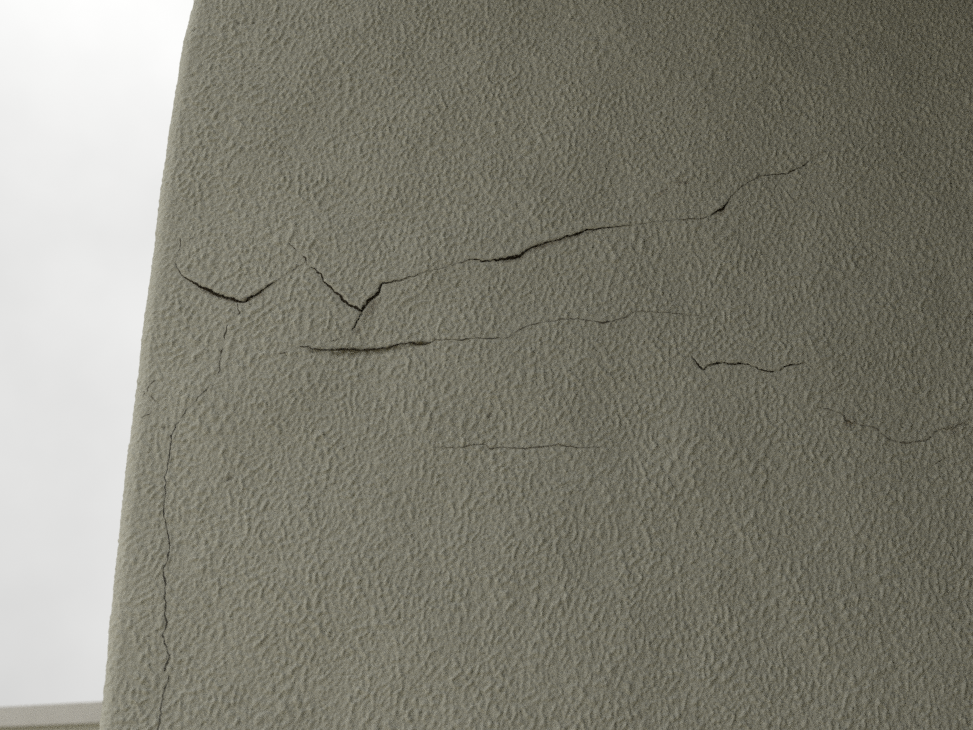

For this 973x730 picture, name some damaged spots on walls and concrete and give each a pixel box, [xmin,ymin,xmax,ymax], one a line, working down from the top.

crack [157,151,826,730]
crack [824,408,961,444]